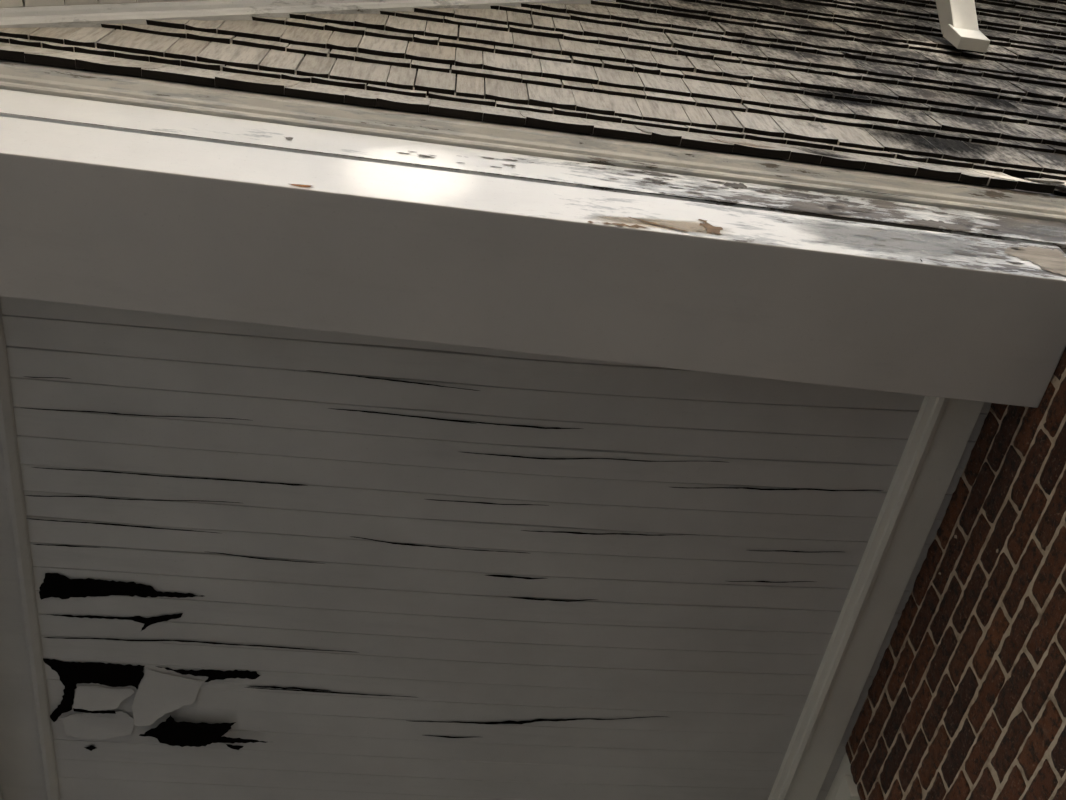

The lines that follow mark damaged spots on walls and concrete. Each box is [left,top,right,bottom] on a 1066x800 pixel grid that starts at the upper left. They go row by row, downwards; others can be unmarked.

peeling [588,166,779,204]
peeling [588,217,688,232]
peeling [698,219,723,235]
peeling [812,196,1066,276]
crack [328,408,581,429]
crack [463,452,679,462]
crack [25,467,325,564]
crack [350,530,692,602]
peeling [39,573,203,600]
crack [44,613,351,652]
peeling [43,658,266,751]
crack [246,686,664,738]